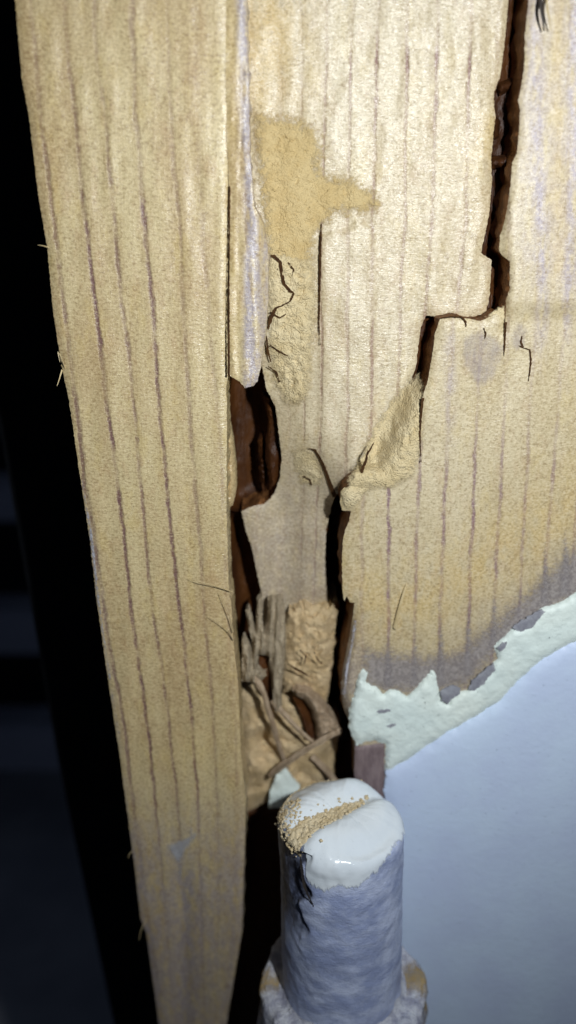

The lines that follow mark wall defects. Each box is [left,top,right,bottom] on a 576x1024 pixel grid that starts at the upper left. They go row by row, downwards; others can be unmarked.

crack [266,222,322,382]
crack [441,316,532,381]
crack [417,398,425,462]
crack [303,443,374,498]
peeling [348,592,576,799]